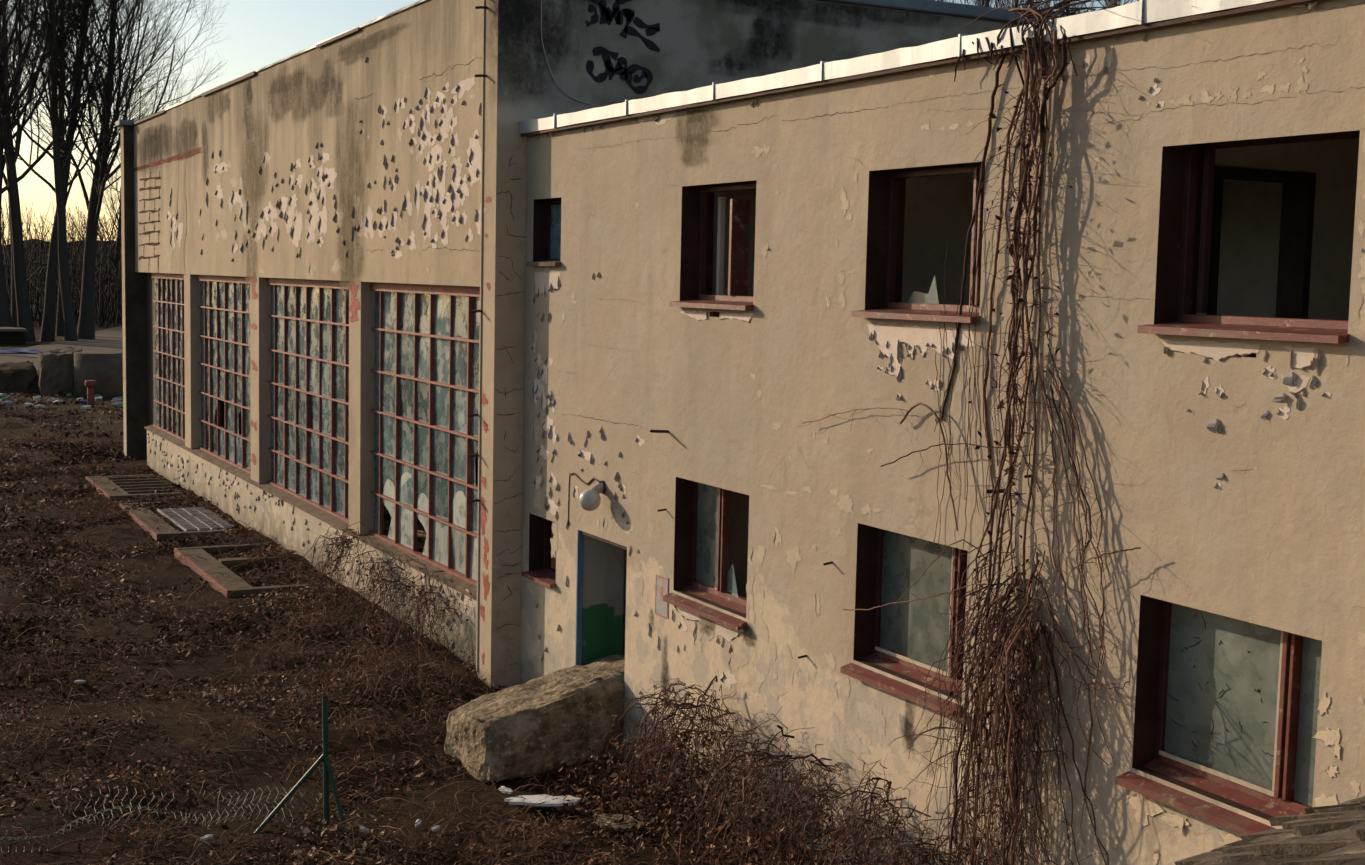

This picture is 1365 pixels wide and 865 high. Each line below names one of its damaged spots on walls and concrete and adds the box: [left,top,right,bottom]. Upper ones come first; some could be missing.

crack [1064,2,1364,147]
peeling [139,77,492,322]
peeling [680,310,753,323]
peeling [868,324,976,401]
peeling [1160,339,1331,420]
peeling [531,272,644,596]
peeling [1313,691,1360,796]
peeling [1126,793,1189,836]
peeling [1215,832,1242,846]
peeling [1315,793,1339,807]